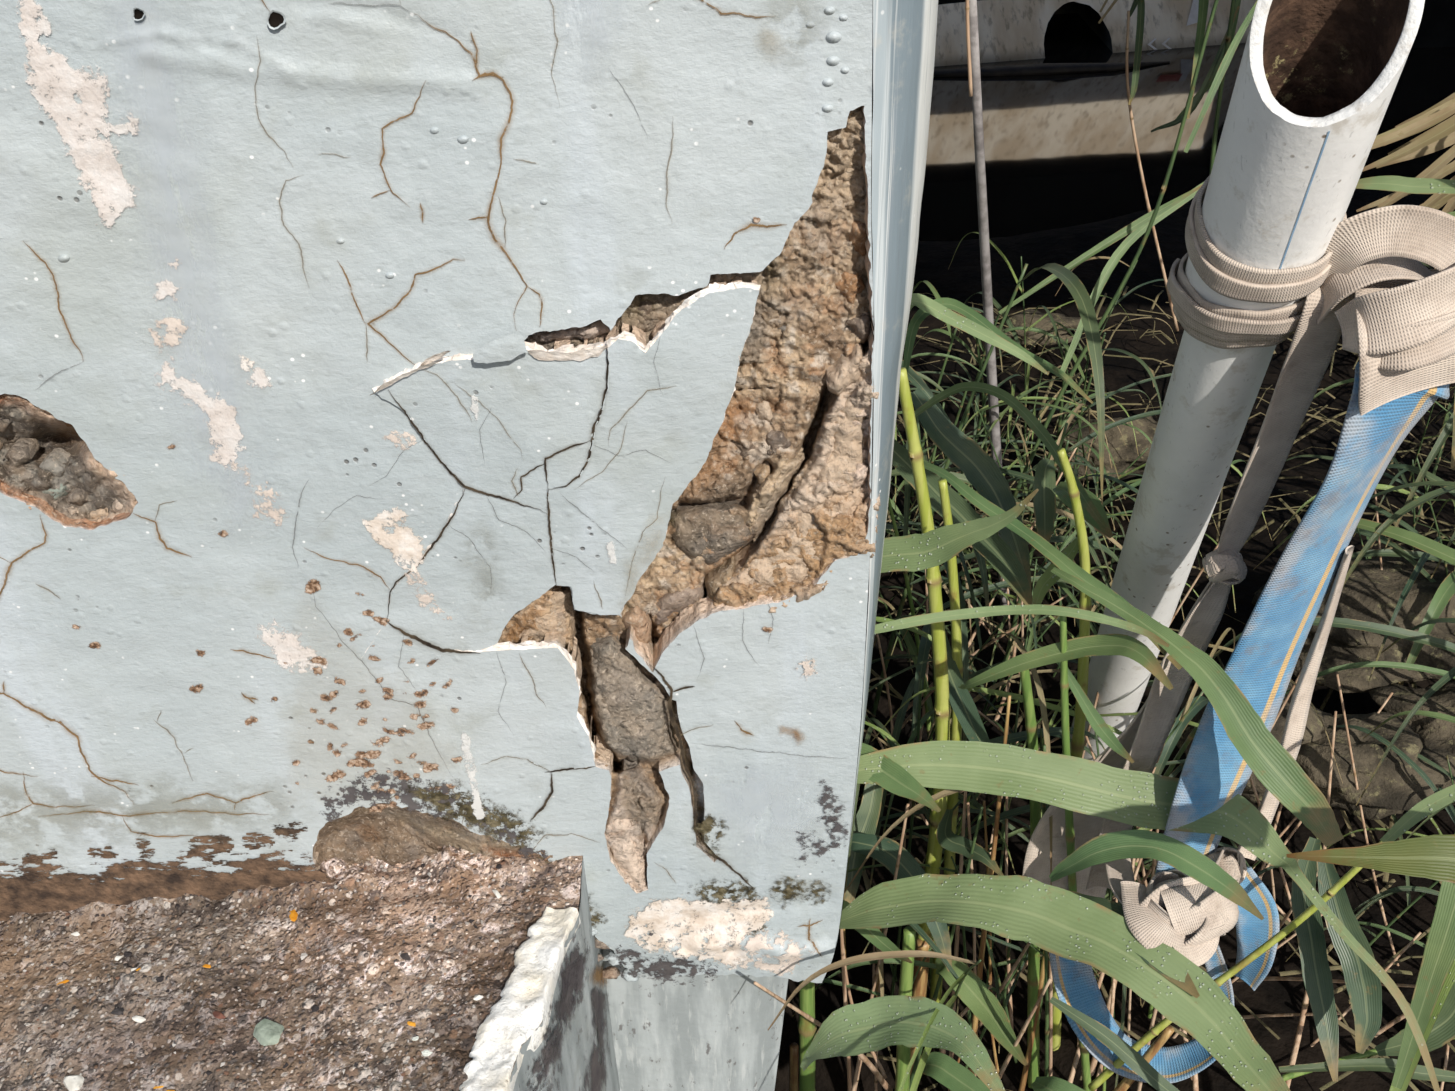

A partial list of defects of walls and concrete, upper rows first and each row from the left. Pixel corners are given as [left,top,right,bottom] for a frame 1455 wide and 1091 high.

crack [701,0,770,18]
peeling [16,0,139,229]
crack [725,223,785,247]
crack [25,243,82,386]
peeling [148,259,286,526]
crack [255,0,674,856]
crack [0,518,59,598]
crack [135,501,189,556]
spalling [498,98,881,976]
crack [0,682,267,837]
water stain [319,772,549,864]
crack [652,628,832,887]